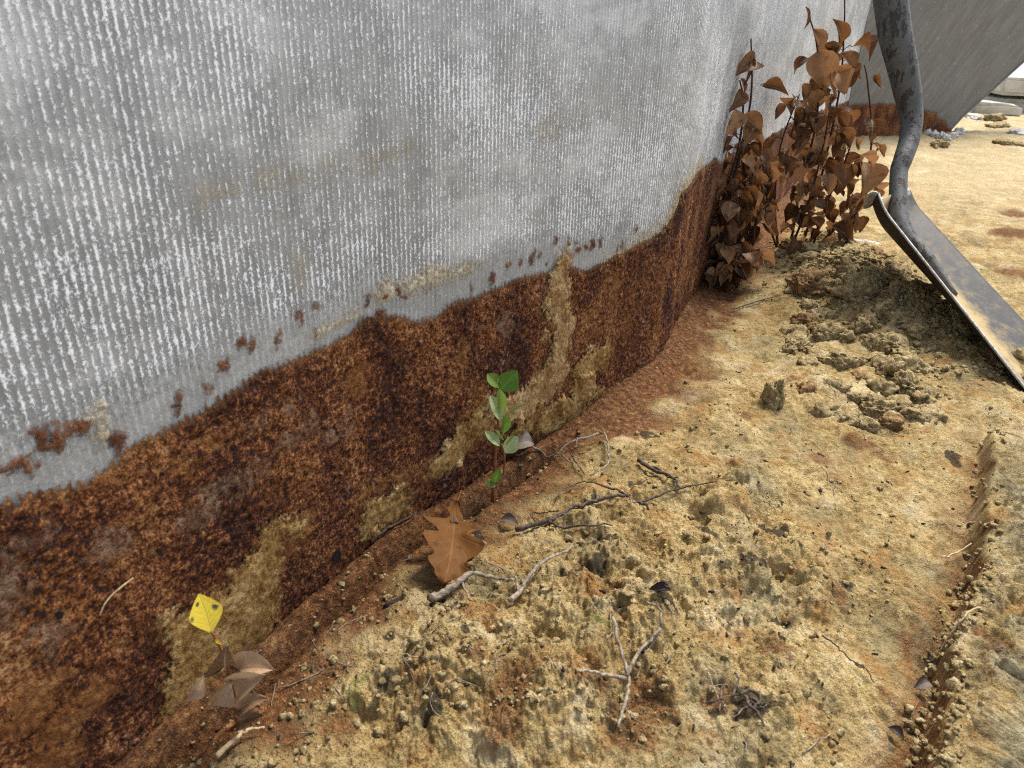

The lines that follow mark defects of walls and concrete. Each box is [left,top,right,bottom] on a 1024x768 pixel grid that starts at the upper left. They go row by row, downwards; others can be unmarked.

rust [751,101,900,227]
leakage [0,221,634,507]
rust [0,154,740,768]